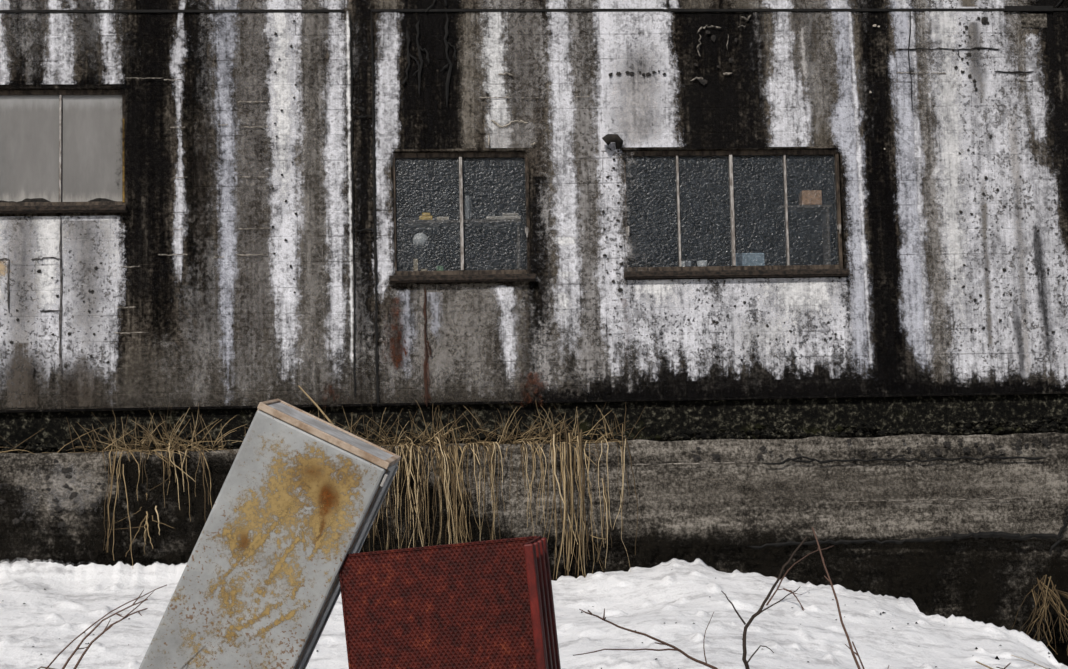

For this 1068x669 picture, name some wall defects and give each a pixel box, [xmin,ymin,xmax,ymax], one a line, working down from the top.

water stain [0,0,1068,412]
rust [385,298,408,368]
water stain [0,453,236,567]
water stain [359,452,516,553]
crack [762,453,1045,465]
crack [748,481,1068,555]
water stain [544,524,1068,647]